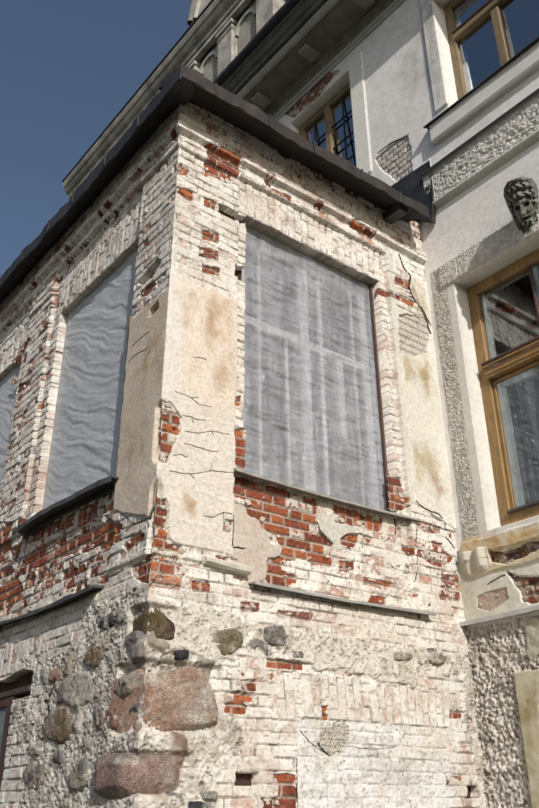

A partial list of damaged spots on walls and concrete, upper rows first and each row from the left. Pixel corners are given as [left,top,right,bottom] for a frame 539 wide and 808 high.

spalling [204,143,244,184]
flaking render [376,137,412,181]
crack [399,254,431,334]
spalling [159,402,181,463]
crack [122,391,234,532]
spalling [233,428,382,588]
spalling [386,473,413,511]
flaking render [240,601,259,613]
flaking render [363,578,390,608]
spalling [402,521,460,601]
spalling [477,541,539,611]
crack [300,730,395,753]